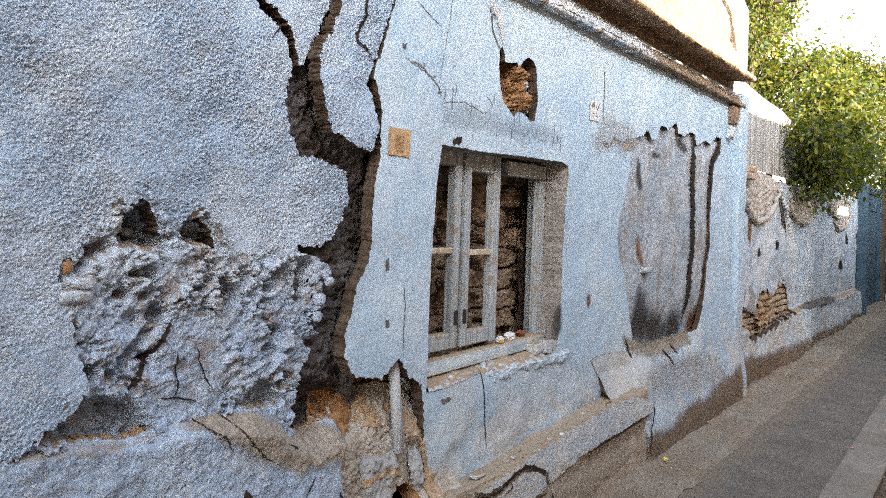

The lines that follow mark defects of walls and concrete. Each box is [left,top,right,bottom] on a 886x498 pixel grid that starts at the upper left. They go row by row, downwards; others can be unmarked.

crack [355,0,372,60]
spalling [490,2,506,49]
spalling [499,62,533,116]
crack [259,5,370,428]
peeling [601,125,736,345]
spalling [27,184,654,498]
flaking render [742,283,790,340]
crack [477,464,554,498]